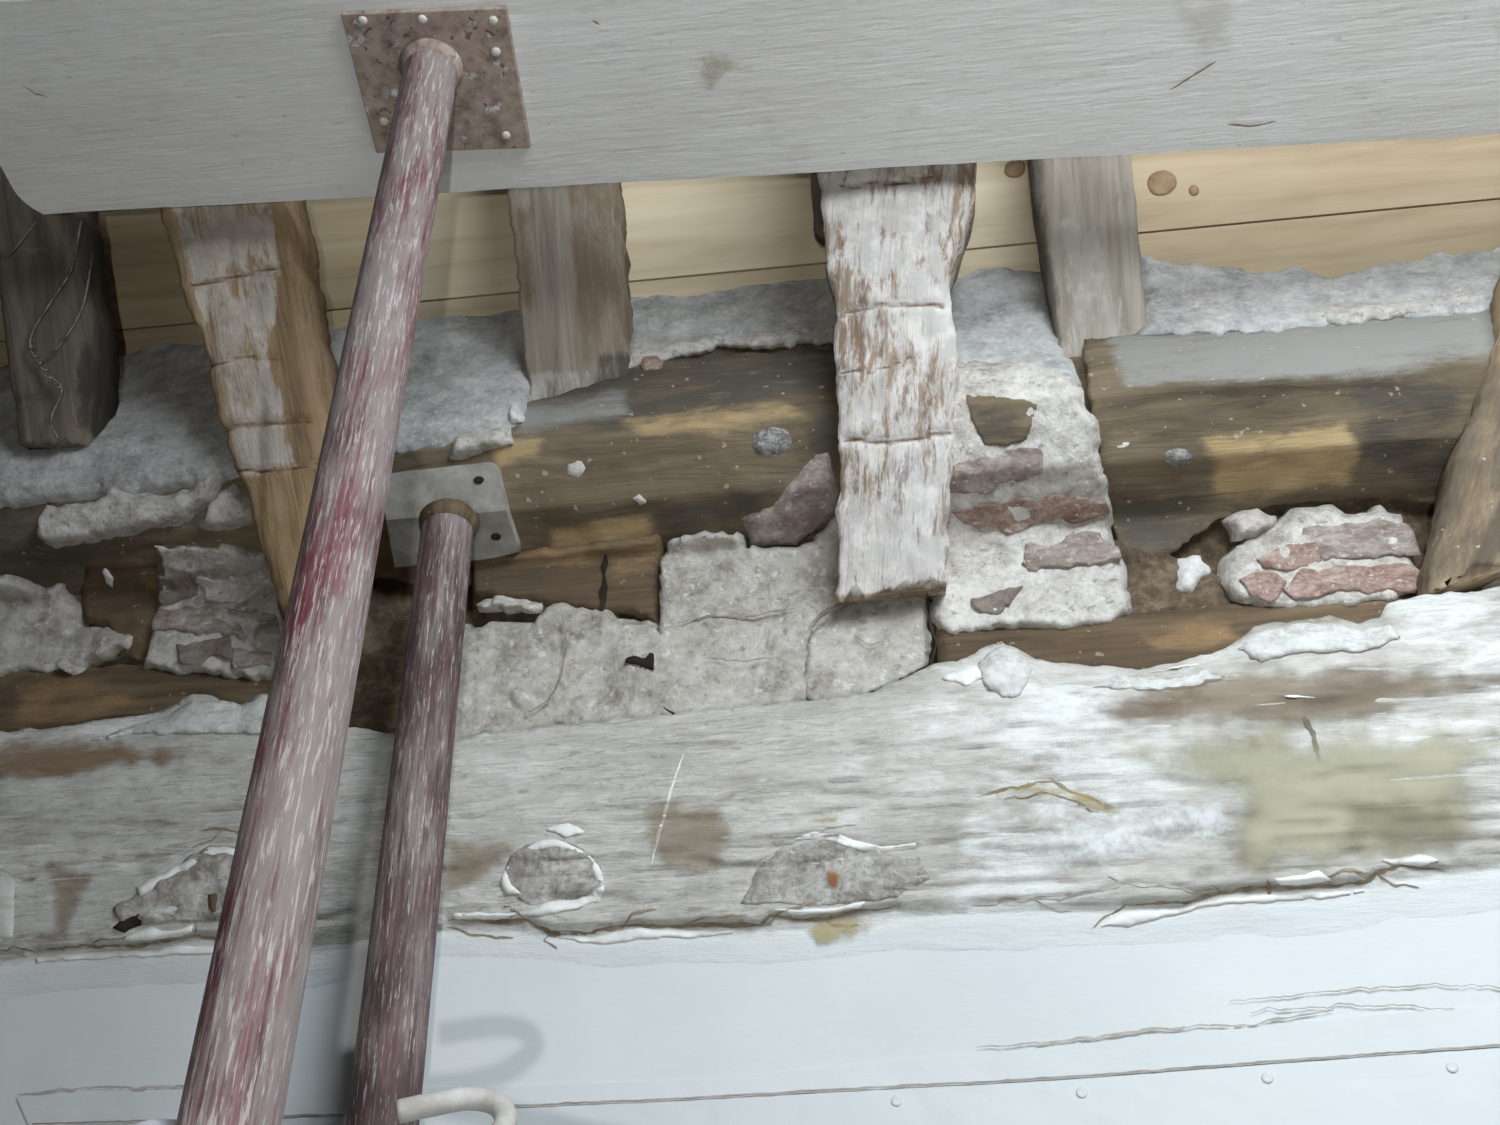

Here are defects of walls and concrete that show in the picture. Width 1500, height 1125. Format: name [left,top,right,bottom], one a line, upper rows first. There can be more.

leakage [1029,669,1500,865]
flaking render [113,845,235,933]
flaking render [500,823,604,916]
corrosion [827,871,837,886]
flaking render [741,839,929,906]
crack [972,854,1441,928]
crack [0,921,216,963]